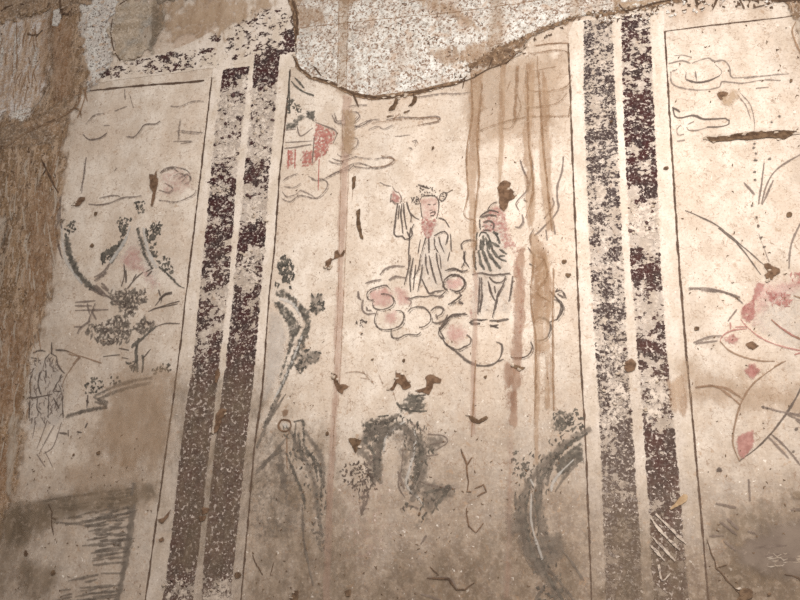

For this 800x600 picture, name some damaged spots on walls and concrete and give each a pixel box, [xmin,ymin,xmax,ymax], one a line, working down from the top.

peeling [0,8,61,122]
flaking render [77,0,166,92]
peeling [288,0,800,117]
leakage [464,72,483,237]
leakage [513,66,552,231]
leakage [530,254,555,412]